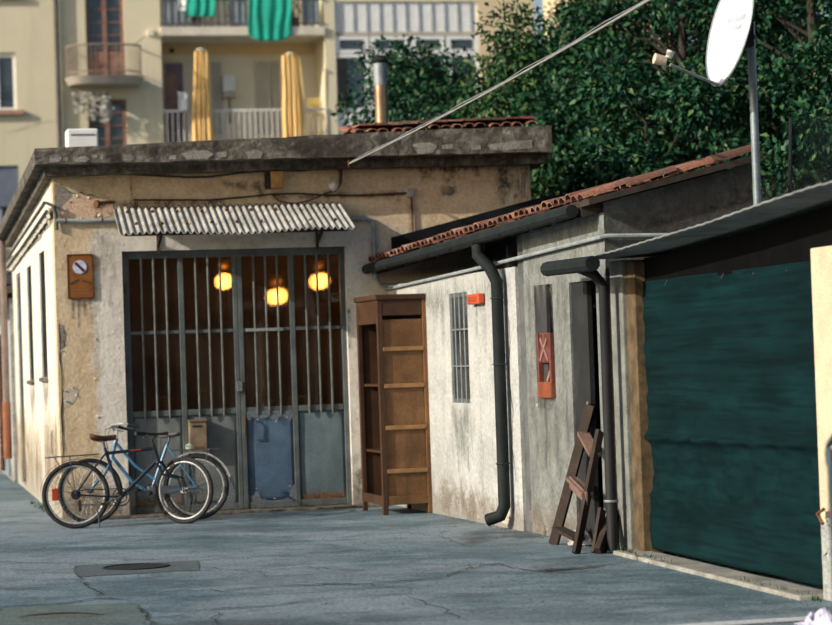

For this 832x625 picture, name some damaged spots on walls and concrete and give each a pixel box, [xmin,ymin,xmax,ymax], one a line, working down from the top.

peeling [6,184,113,273]
crack [0,530,639,625]